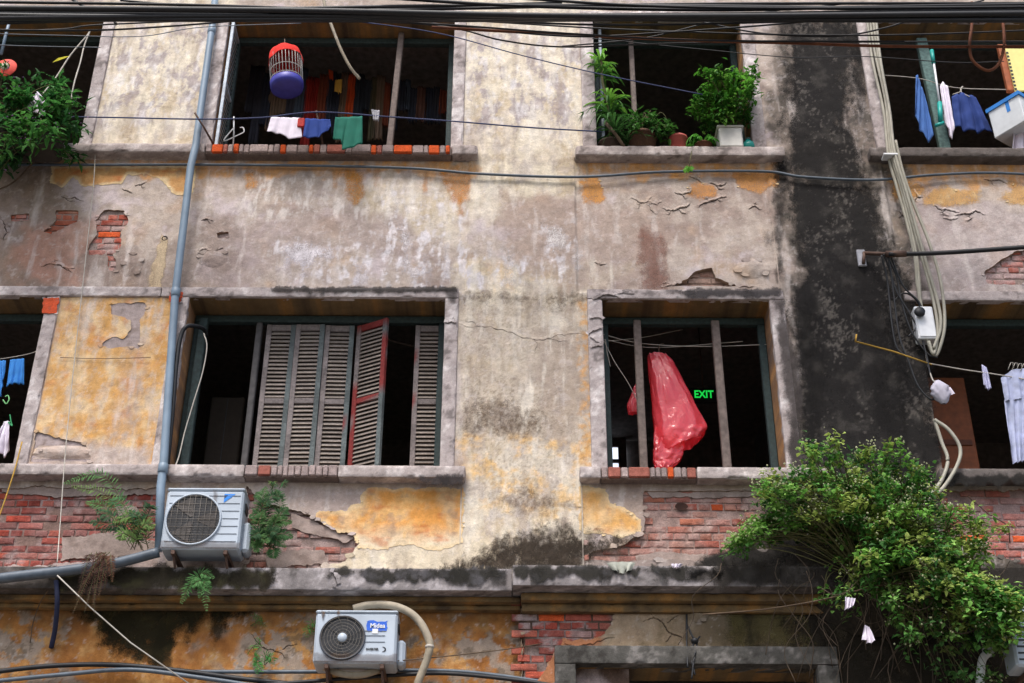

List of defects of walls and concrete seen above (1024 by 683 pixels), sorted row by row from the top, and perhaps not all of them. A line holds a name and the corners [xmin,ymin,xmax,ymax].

spalling [43,211,78,234]
spalling [89,211,130,273]
spalling [98,302,150,349]
leakage [327,23,1024,590]
spalling [675,270,735,288]
spalling [982,250,1024,285]
spalling [0,485,156,567]
peeling [242,487,465,568]
spalling [578,485,776,563]
leakage [72,611,252,667]
spalling [510,599,619,683]
spalling [576,669,629,683]